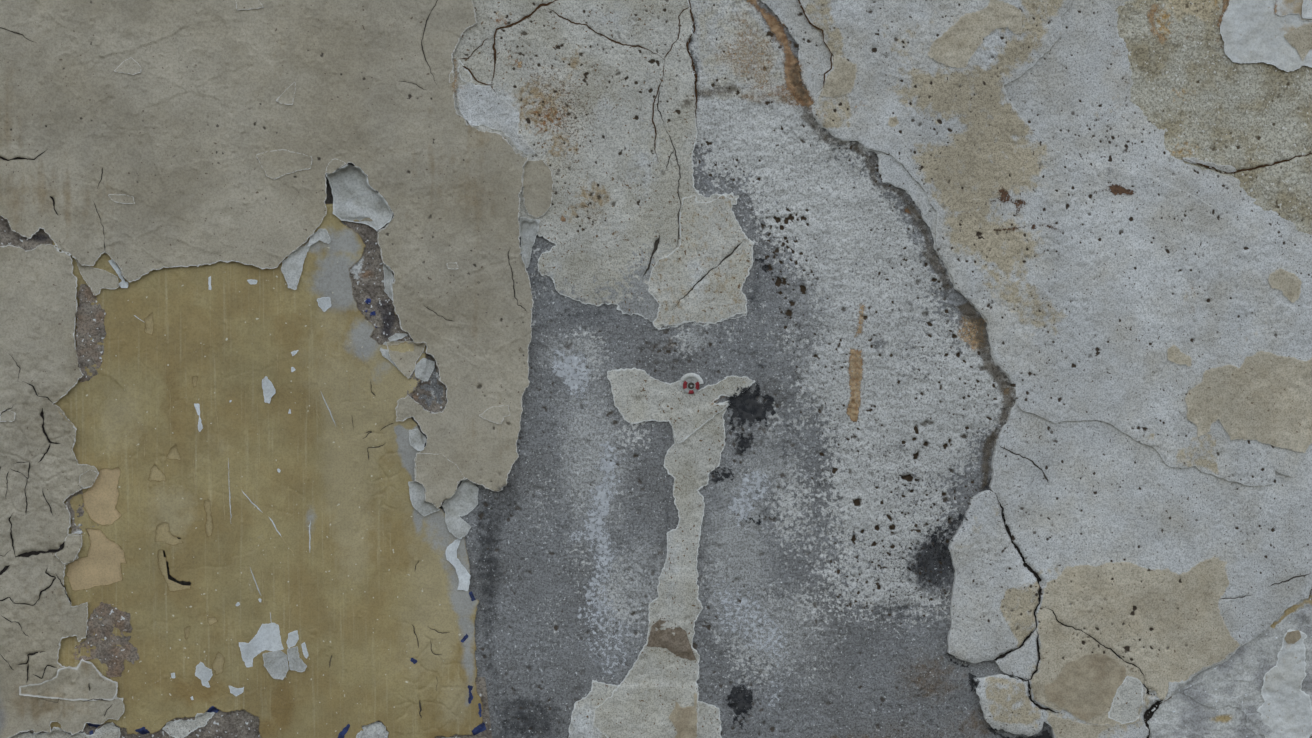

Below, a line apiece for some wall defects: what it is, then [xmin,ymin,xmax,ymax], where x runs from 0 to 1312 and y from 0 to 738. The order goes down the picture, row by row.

spalling [0,216,62,252]
crack [461,0,697,277]
corrosion [722,0,814,108]
spalling [1115,0,1312,235]
crack [1188,153,1312,174]
spalling [19,0,1053,738]
corrosion [847,305,865,422]
crack [0,357,112,716]
crack [999,445,1049,483]
crack [994,497,1162,738]
spalling [1145,592,1312,738]
crack [1221,573,1312,599]